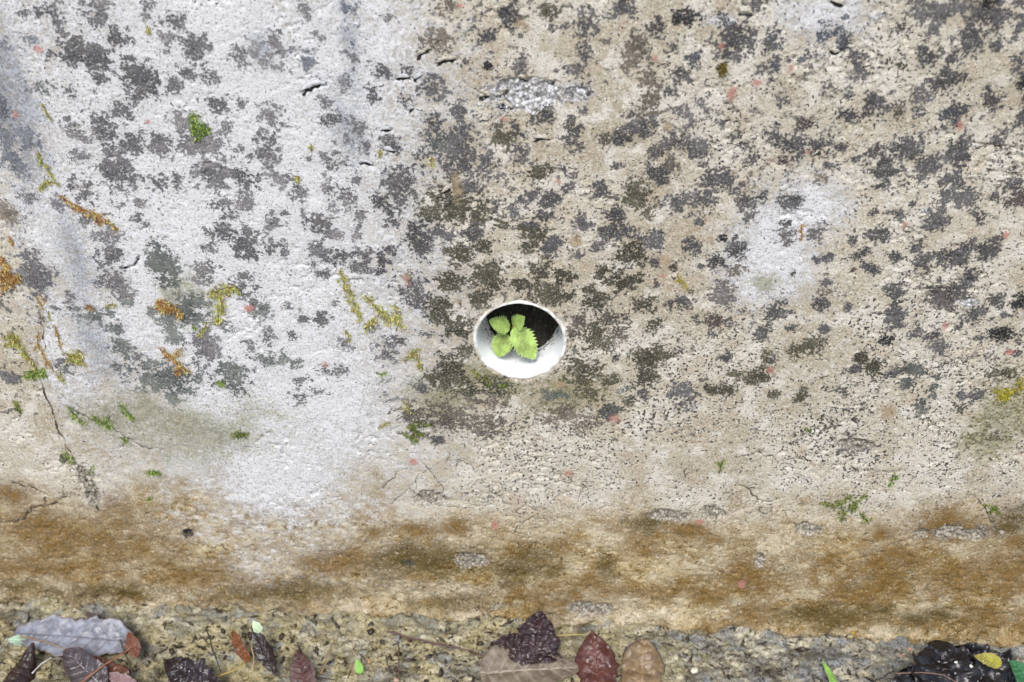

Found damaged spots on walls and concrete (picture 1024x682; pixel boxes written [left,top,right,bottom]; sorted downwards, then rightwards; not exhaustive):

spalling [472,72,593,122]
leakage [0,0,620,614]
crack [3,380,159,523]
leakage [635,514,720,555]
leakage [656,505,1024,634]